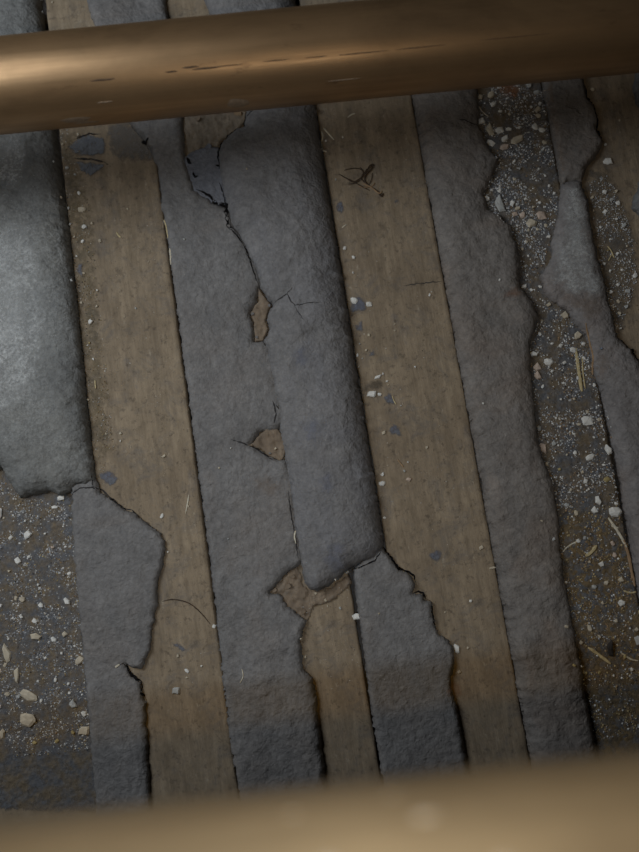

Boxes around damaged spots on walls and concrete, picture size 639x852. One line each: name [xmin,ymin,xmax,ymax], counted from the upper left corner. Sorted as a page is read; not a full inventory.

spalling [486,123,524,150]
crack [186,111,259,286]
spalling [251,290,272,342]
spalling [591,496,622,517]
spalling [270,567,352,621]
spalling [20,713,35,727]